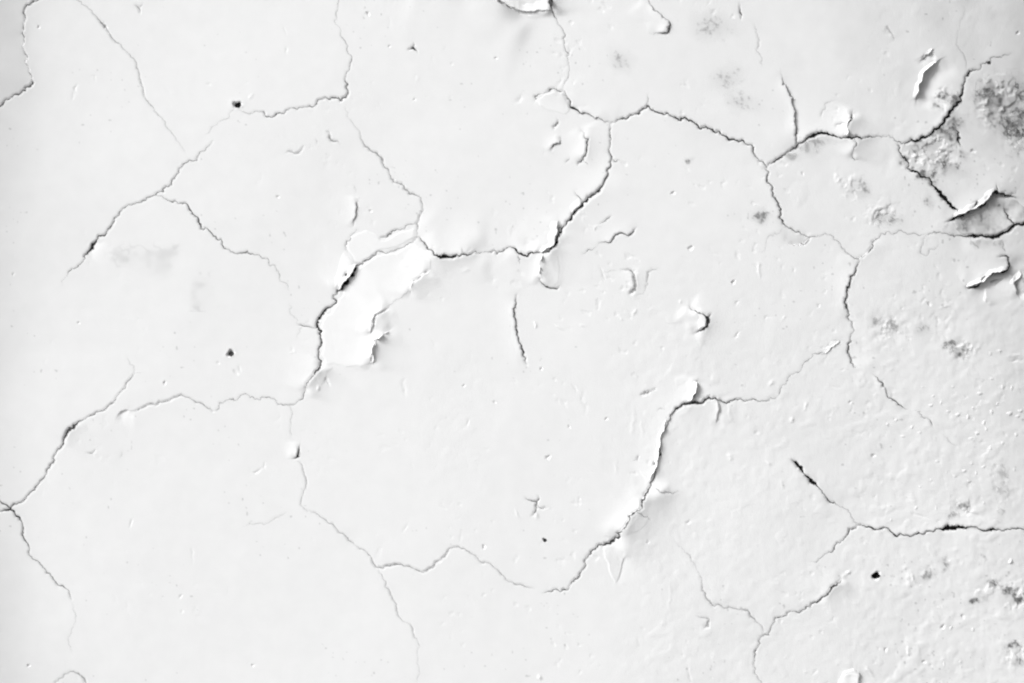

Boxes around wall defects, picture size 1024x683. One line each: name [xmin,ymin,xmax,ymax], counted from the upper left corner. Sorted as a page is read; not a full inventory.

crack [1,0,38,106]
crack [78,0,177,141]
peeling [500,0,551,12]
peeling [913,48,937,99]
crack [63,122,288,286]
spalling [321,228,431,367]
crack [138,13,1024,644]
spalling [953,188,1024,236]
peeling [966,266,1024,294]
crack [0,358,141,635]
crack [679,546,841,683]